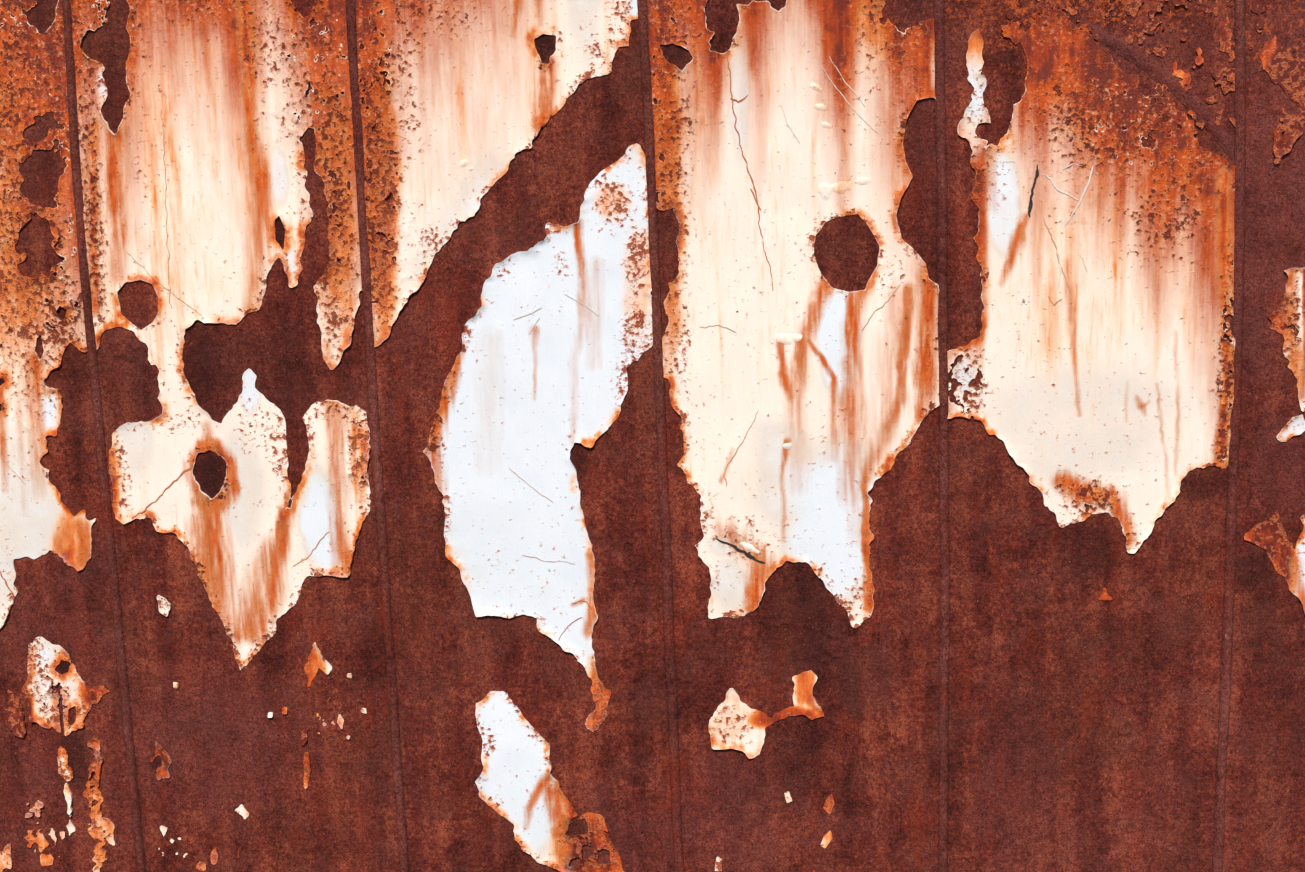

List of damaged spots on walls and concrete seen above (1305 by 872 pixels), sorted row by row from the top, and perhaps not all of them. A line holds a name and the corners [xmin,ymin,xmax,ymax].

rust [0,0,541,318]
rust [647,0,726,208]
rust [804,0,936,168]
rust [971,140,993,298]
rust [1002,2,1236,469]
rust [189,432,298,641]
rust [426,343,464,489]
peeling [0,0,939,872]
rust [728,528,771,612]
rust [777,263,936,611]
rust [1054,472,1134,547]
peeling [896,0,1305,872]